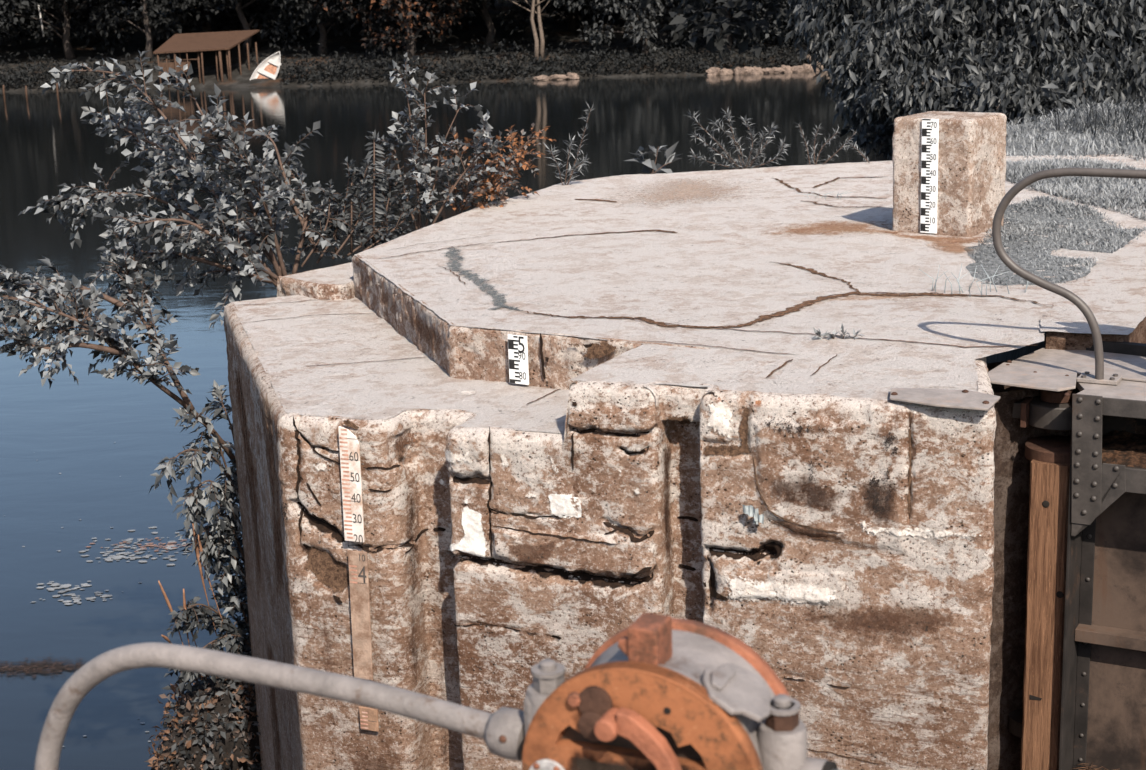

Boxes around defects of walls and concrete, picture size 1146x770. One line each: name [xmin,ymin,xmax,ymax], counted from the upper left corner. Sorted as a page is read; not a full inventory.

crack [775,176,887,207]
crack [380,229,1045,405]
crack [293,416,446,554]
water stain [772,454,835,510]
water stain [863,468,894,520]
peeling [447,499,487,557]
crack [679,563,696,571]
spalling [709,568,720,599]
spalling [757,542,782,564]